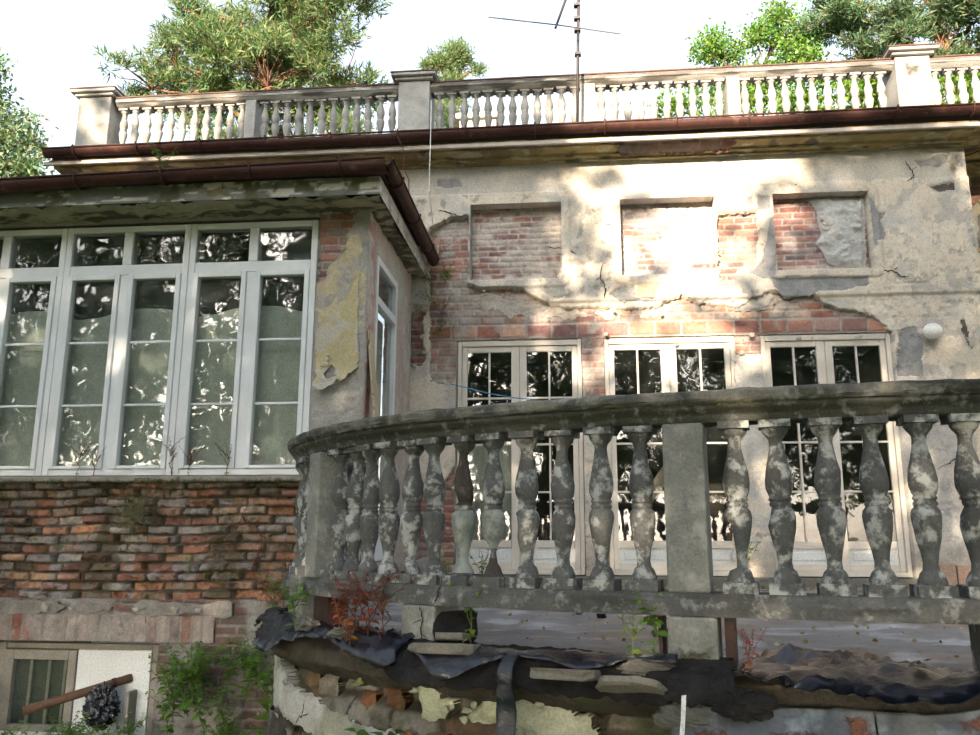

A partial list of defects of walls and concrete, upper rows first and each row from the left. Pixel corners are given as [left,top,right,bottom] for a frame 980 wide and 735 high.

flaking render [971,178,980,253]
peeling [312,210,379,417]
flaking render [410,195,924,396]
peeling [273,655,496,735]
peeling [515,700,602,735]